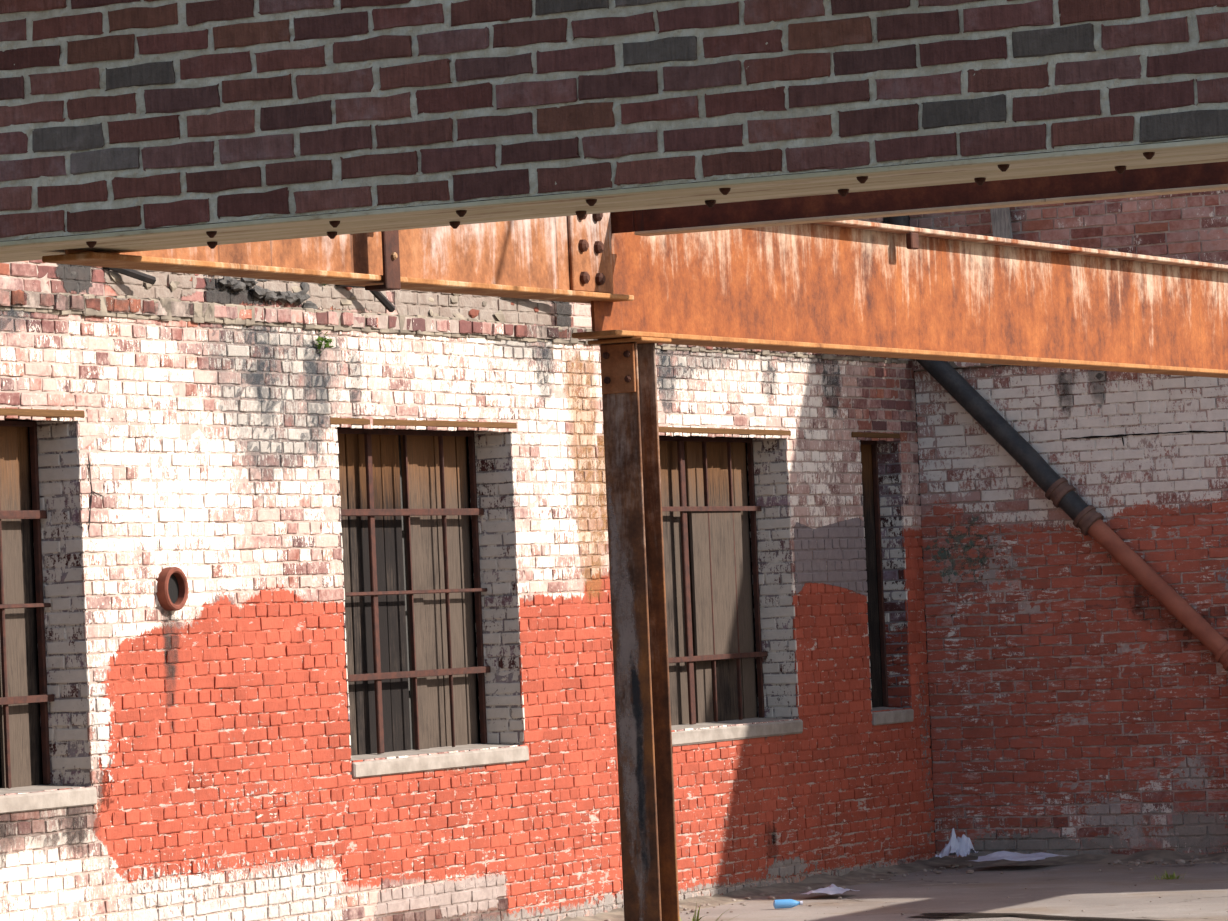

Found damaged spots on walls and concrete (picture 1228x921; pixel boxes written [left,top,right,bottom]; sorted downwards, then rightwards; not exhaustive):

peeling [87,669,118,788]
peeling [112,837,355,921]
peeling [374,870,508,918]